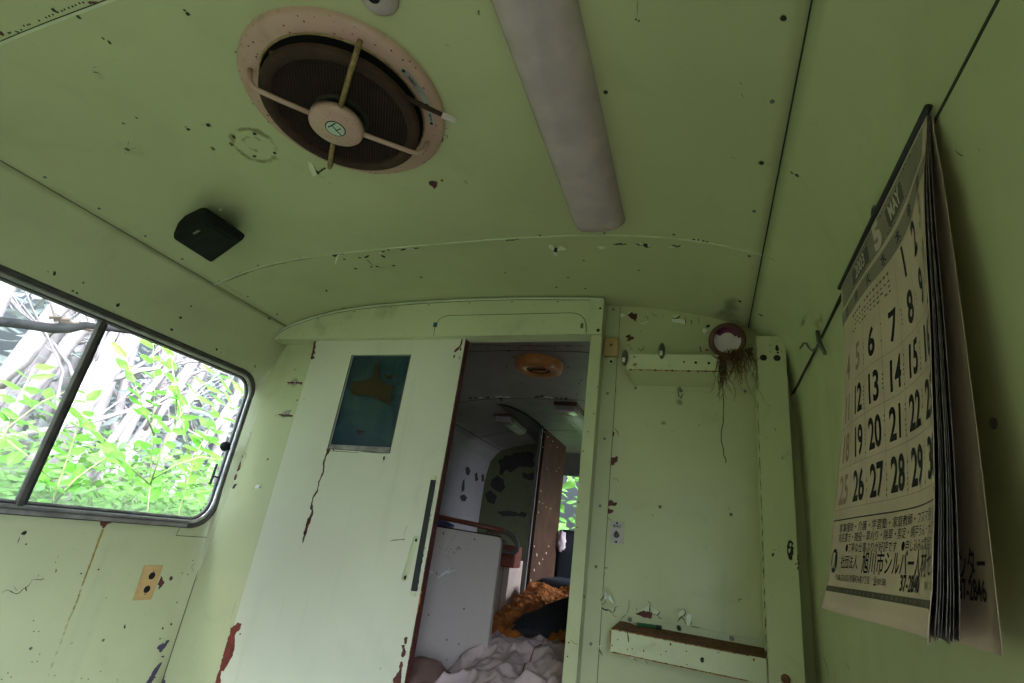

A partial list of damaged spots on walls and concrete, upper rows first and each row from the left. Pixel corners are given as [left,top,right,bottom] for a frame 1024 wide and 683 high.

crack [302,449,334,543]
peeling [146,623,172,683]
peeling [215,599,242,683]
peeling [393,637,411,683]
peeling [620,601,699,628]